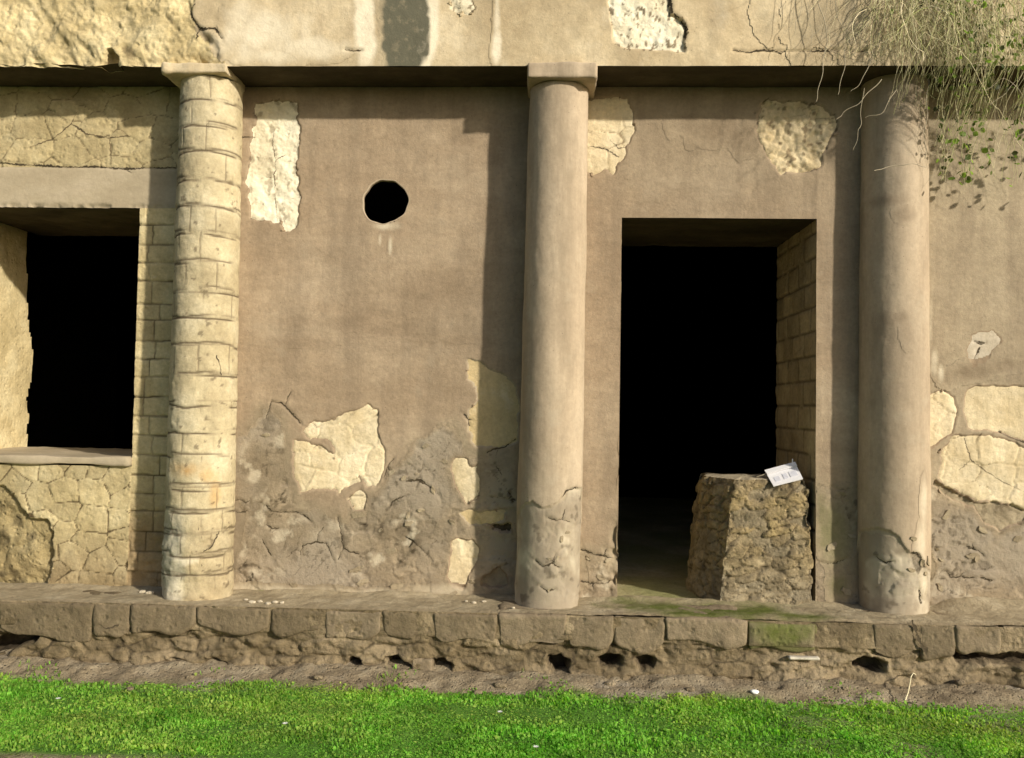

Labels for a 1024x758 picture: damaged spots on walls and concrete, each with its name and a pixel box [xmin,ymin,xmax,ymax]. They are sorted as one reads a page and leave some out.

spalling [0,0,225,73]
peeling [608,0,689,52]
crack [733,47,868,55]
crack [0,112,176,173]
peeling [245,101,301,232]
peeling [587,97,636,177]
peeling [754,100,838,175]
peeling [967,330,1001,359]
spalling [234,359,615,615]
spalling [816,386,1024,615]